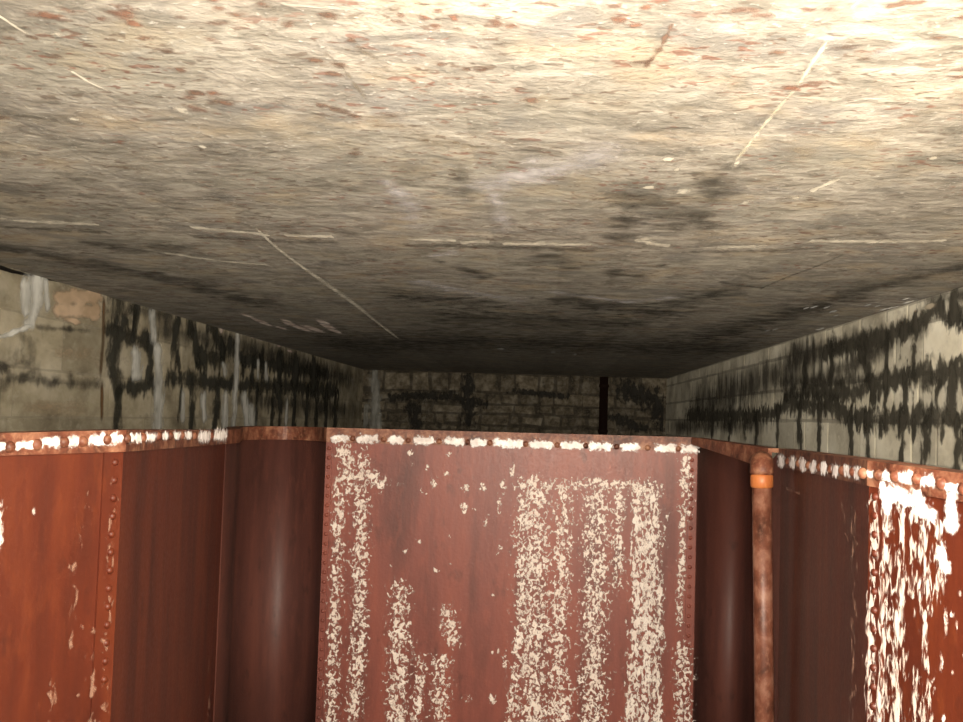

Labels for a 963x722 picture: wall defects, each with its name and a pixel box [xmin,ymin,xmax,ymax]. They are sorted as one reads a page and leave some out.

corrosion [886,0,926,8]
corrosion [113,6,149,40]
crack [634,24,673,67]
corrosion [309,58,345,76]
corrosion [186,91,233,112]
corrosion [316,103,359,118]
damp [0,275,50,338]
damp [255,228,963,722]
damp [0,297,664,722]